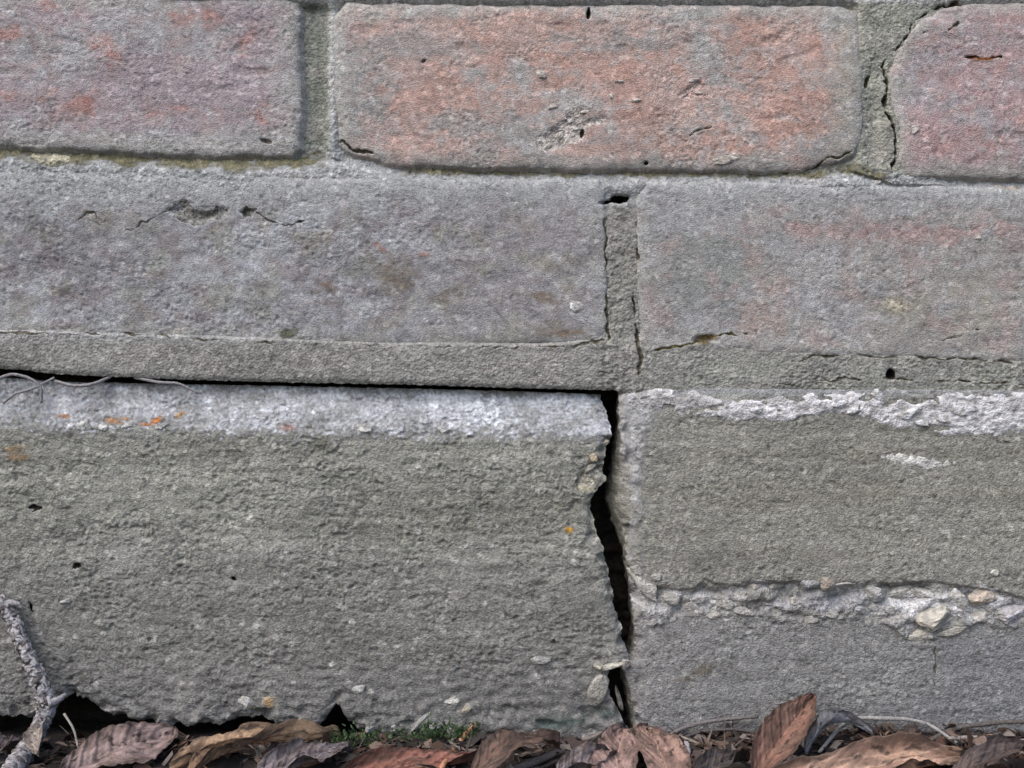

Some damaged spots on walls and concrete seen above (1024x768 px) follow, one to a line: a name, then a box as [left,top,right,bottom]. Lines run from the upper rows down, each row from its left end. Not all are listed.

crack [880,0,961,182]
crack [76,211,102,226]
crack [478,218,752,375]
crack [0,330,324,346]
crack [0,369,632,724]
spalling [627,565,1024,645]
flaking render [238,696,277,710]